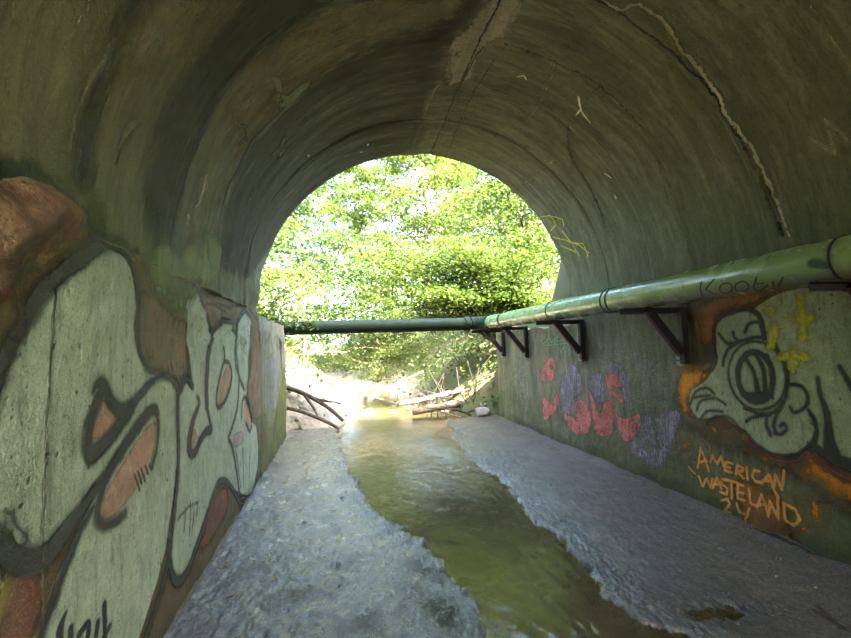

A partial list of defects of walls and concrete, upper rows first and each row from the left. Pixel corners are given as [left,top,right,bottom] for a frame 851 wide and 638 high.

crack [169,0,334,248]
water stain [221,0,520,278]
crack [431,0,641,226]
crack [595,0,791,237]